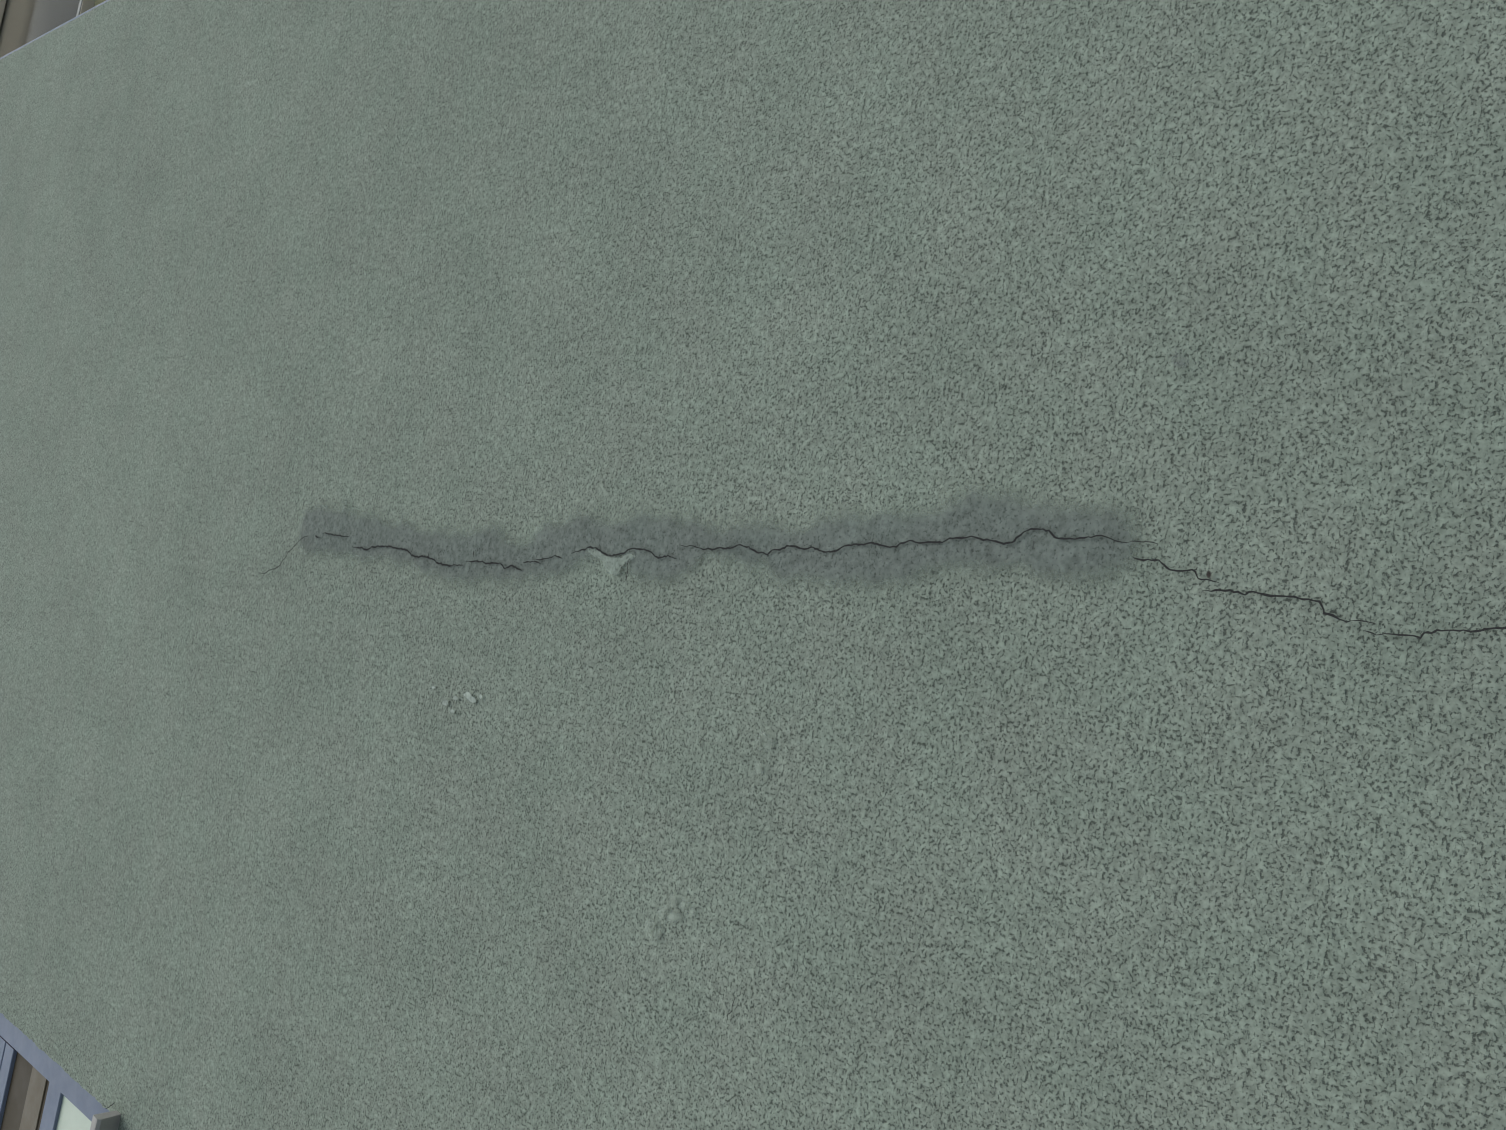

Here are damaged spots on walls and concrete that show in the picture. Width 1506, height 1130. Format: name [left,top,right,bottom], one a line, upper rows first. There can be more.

damp [299,491,1133,584]
crack [261,528,1506,639]